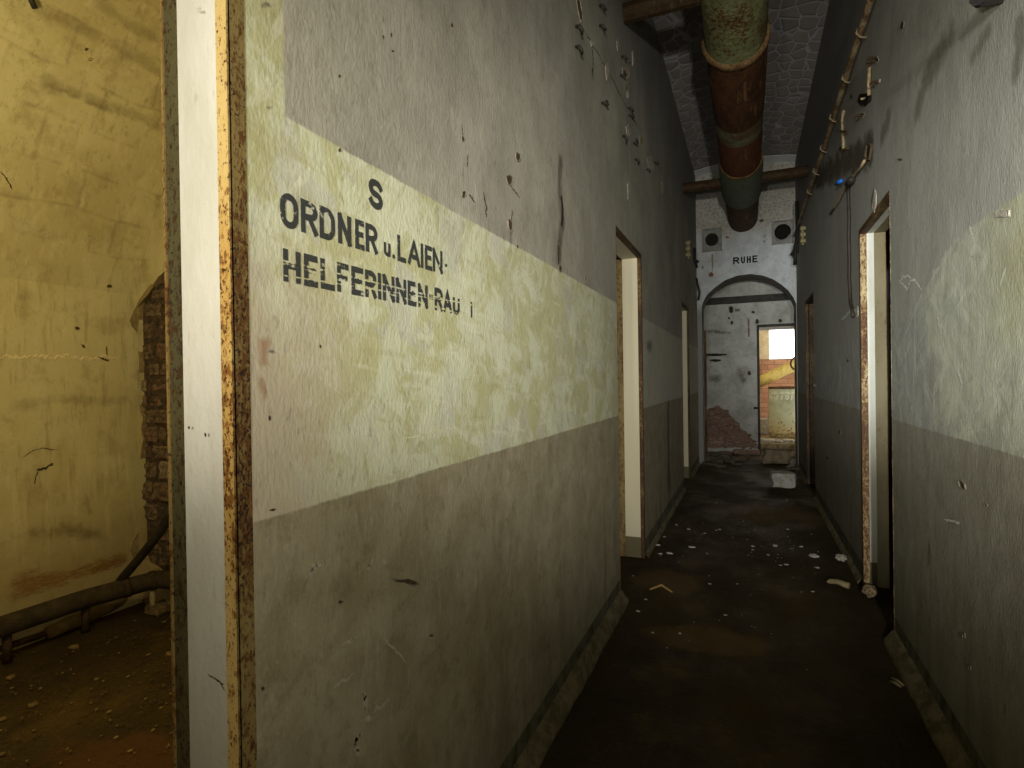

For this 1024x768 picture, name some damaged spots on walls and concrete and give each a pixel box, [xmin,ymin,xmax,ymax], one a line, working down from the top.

rust [706,47,768,177]
crack [23,448,55,484]
spalling [130,276,170,571]